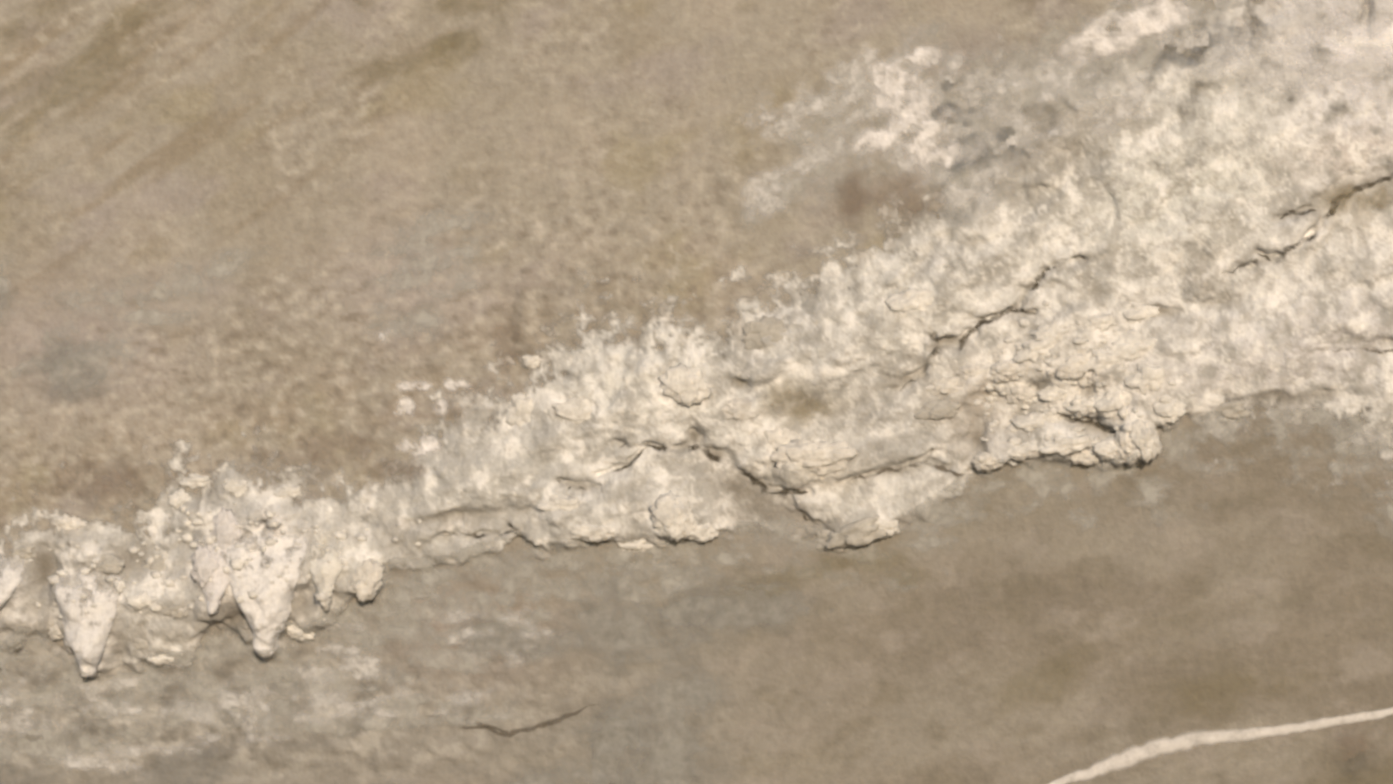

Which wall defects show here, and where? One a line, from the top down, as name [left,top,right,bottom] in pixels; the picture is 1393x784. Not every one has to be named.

crack [1221,177,1391,274]
damp [719,265,751,281]
damp [398,398,415,414]
damp [398,382,431,390]
damp [430,391,446,414]
damp [444,379,468,390]
damp [417,608,583,672]
damp [579,567,796,662]
damp [16,722,129,771]
damp [170,672,352,736]
damp [300,656,381,710]
damp [511,669,717,784]